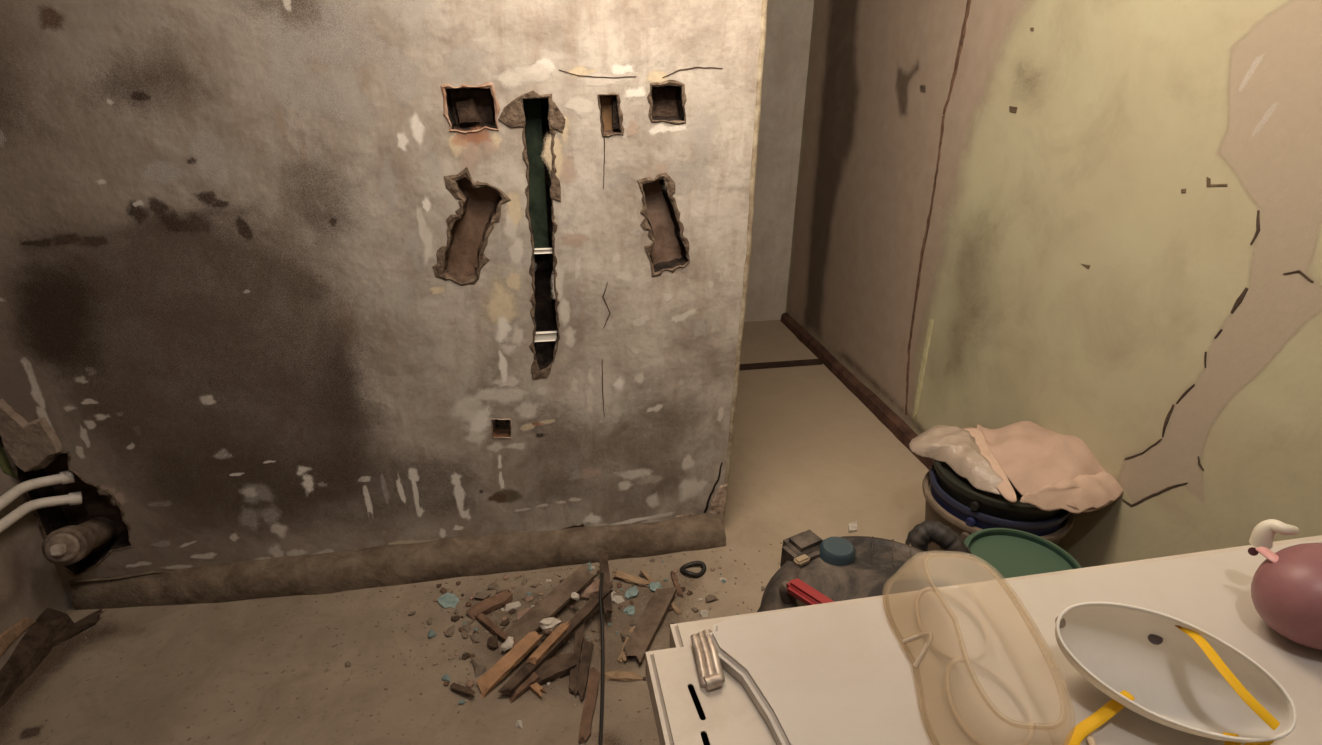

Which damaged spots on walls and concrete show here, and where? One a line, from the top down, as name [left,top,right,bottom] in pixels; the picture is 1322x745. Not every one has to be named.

leakage [893,60,926,118]
spalling [125,189,253,239]
leakage [801,0,863,342]
crack [905,0,971,415]
leakage [0,125,748,554]
crack [0,435,16,478]
peeling [230,483,358,560]
peeling [480,440,727,530]